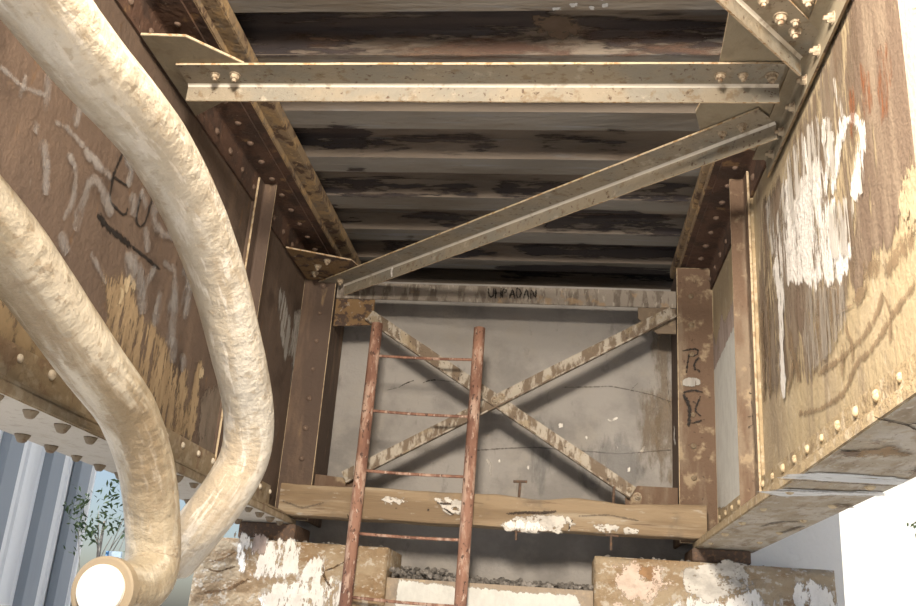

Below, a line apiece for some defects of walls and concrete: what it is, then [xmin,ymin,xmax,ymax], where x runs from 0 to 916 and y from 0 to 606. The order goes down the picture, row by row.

peeling [104,273,221,453]
crack [874,416,916,430]
peeling [434,497,461,515]
peeling [501,515,576,534]
peeling [594,524,639,535]
peeling [236,532,342,606]
peeling [609,559,837,606]